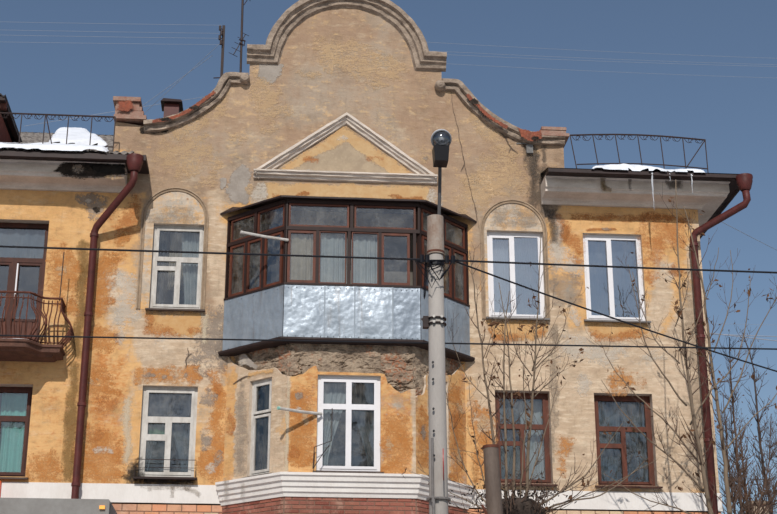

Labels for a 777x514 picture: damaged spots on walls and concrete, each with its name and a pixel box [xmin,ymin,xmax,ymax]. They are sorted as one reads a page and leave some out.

crack [451,93,479,227]
water stain [64,241,89,482]
spalling [134,329,429,484]